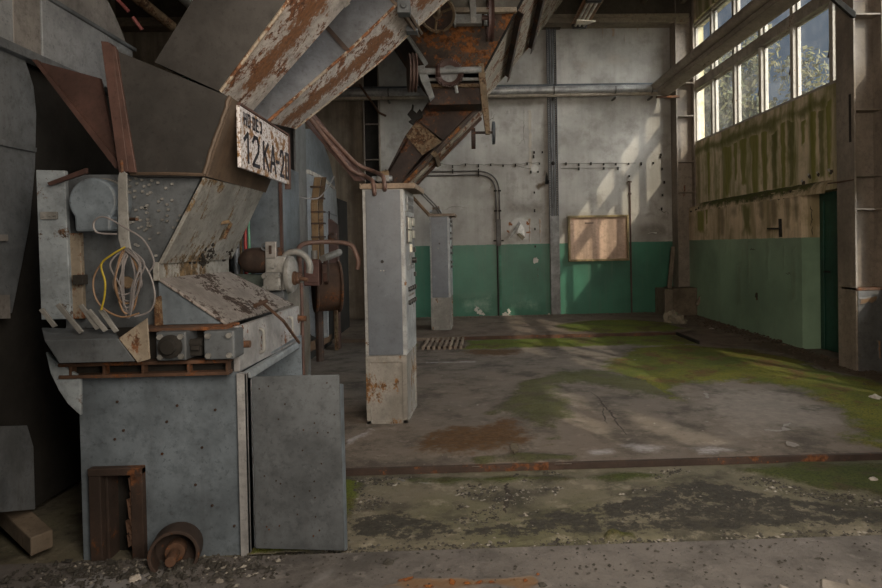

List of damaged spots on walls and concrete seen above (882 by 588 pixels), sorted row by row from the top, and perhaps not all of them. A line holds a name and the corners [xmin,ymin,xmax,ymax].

leakage [695,87,833,240]